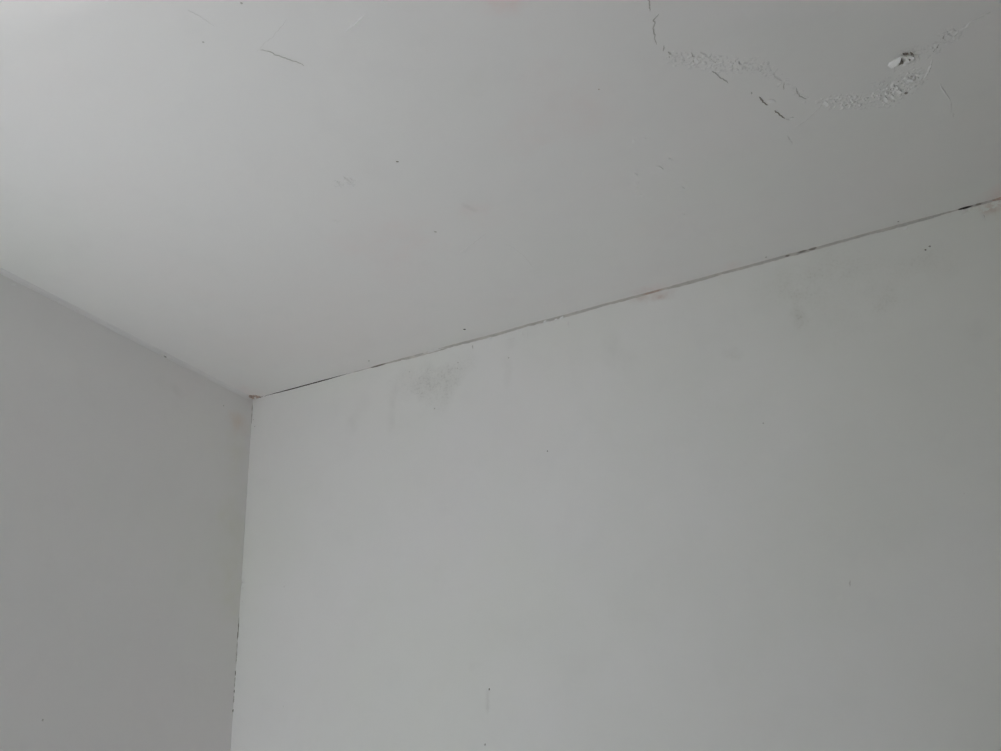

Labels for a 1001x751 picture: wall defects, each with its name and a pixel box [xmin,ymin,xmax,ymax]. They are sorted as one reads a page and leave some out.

crack [633,0,671,58]
spalling [888,44,923,73]
crack [751,92,794,120]